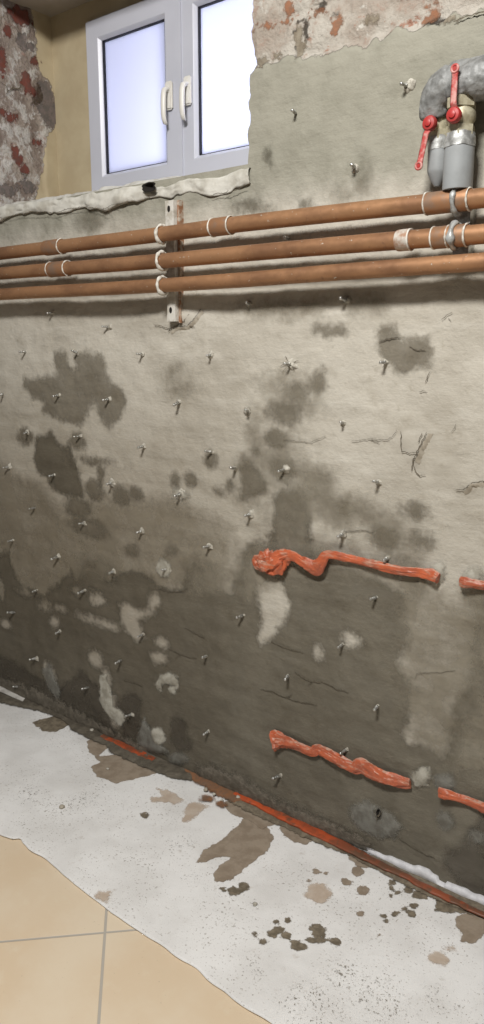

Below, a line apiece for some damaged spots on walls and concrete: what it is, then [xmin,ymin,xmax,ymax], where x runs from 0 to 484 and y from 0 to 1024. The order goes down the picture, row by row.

spalling [251,0,484,70]
peeling [0,0,56,207]
damp [378,327,432,373]
crack [356,424,456,476]
crack [457,481,484,494]
damp [0,353,484,896]